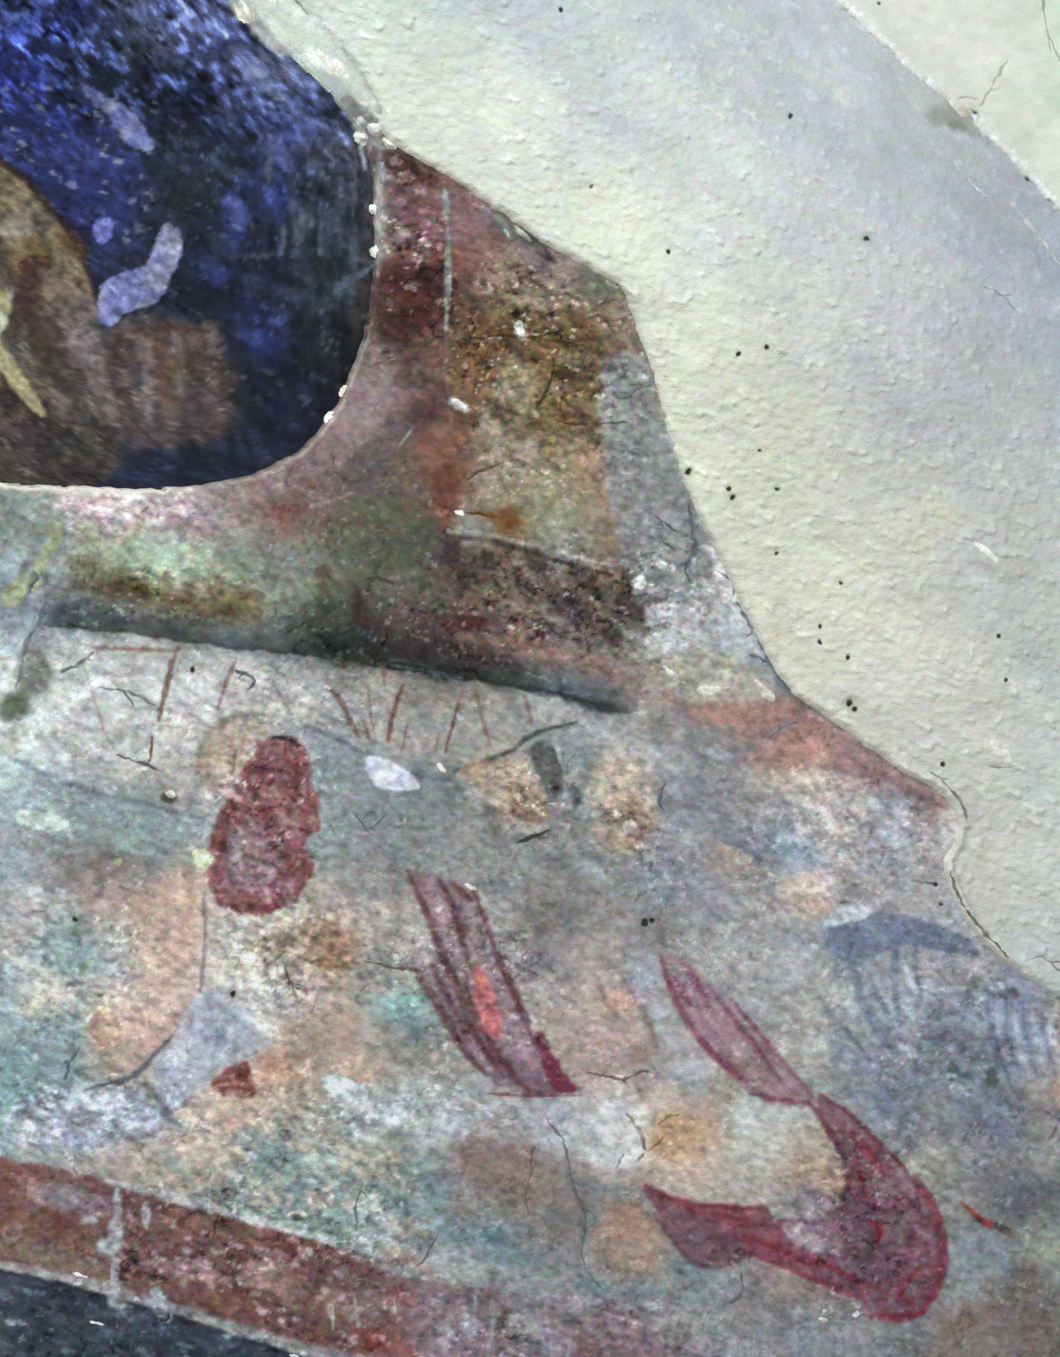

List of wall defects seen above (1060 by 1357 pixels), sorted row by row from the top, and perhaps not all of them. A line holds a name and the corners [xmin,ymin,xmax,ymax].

crack [926,872,1060,999]